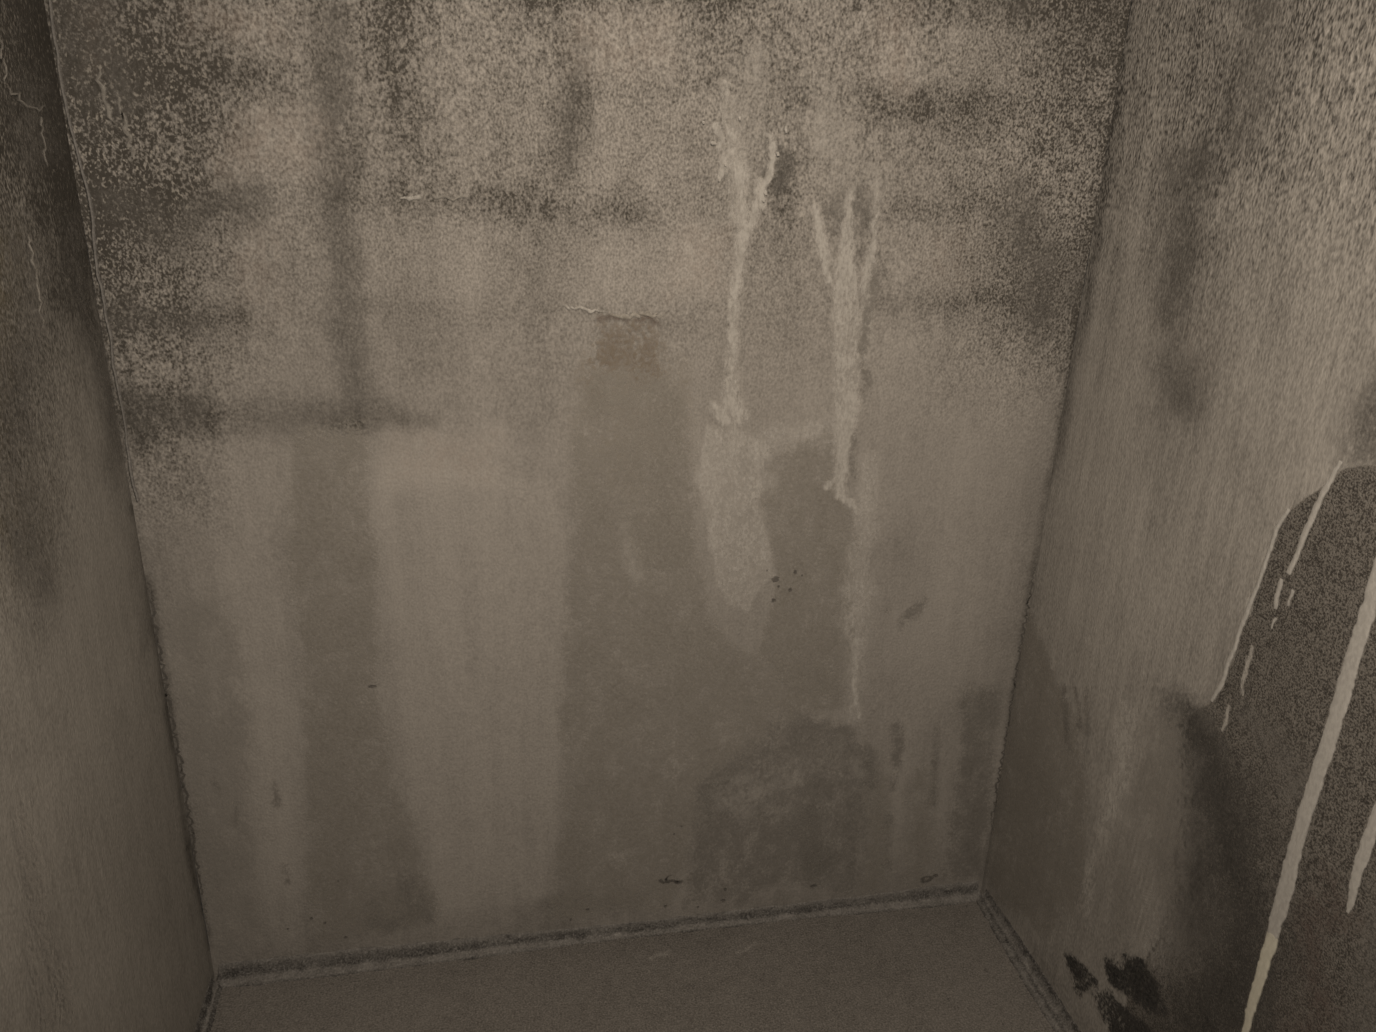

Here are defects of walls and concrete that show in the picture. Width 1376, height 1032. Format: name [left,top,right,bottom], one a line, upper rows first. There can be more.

crack [0,44,47,158]
crack [28,238,43,312]
damp [550,123,1003,923]
damp [1064,373,1376,1032]